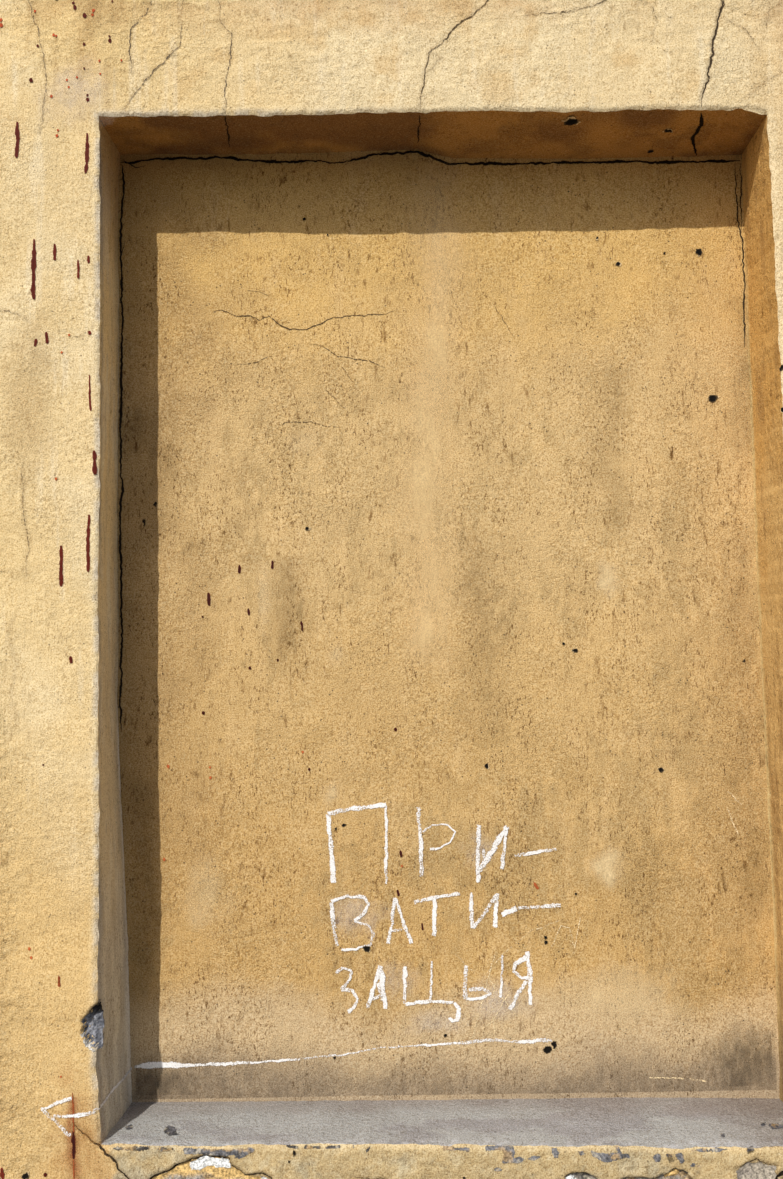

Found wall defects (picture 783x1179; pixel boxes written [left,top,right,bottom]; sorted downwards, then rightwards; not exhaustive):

crack [119,0,767,728]
flaking render [80,999,105,1052]
crack [75,1125,272,1179]
flaking render [113,1125,270,1179]
peeling [578,1146,630,1163]
flaking render [623,1133,726,1179]
flaking render [736,1145,777,1179]